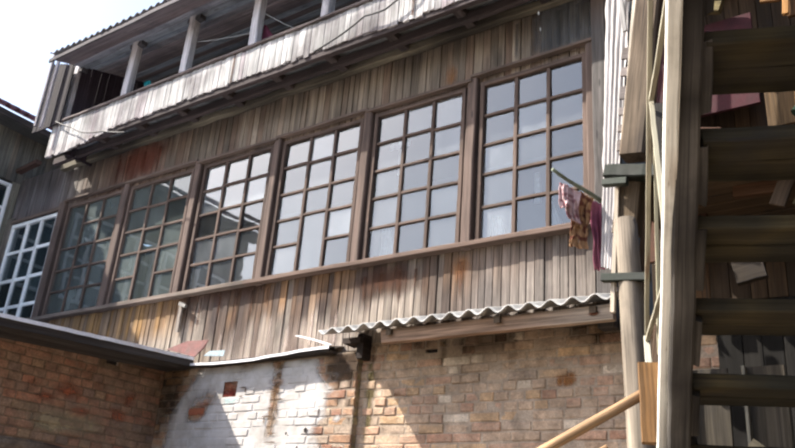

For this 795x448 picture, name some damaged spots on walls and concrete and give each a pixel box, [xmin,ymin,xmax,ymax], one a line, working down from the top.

peeling [165,358,339,448]